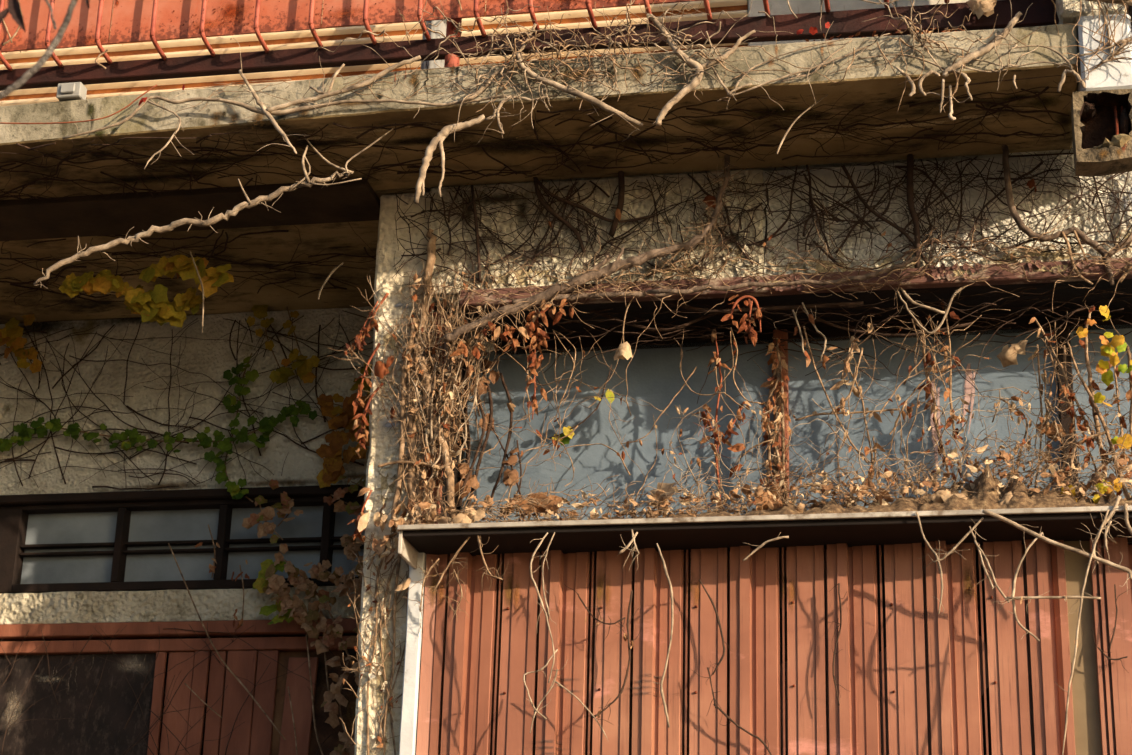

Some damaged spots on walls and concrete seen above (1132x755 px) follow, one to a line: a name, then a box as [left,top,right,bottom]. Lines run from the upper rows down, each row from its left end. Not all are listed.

corrosion [175,4,254,44]
spalling [1081,102,1096,121]
spalling [1092,106,1131,149]